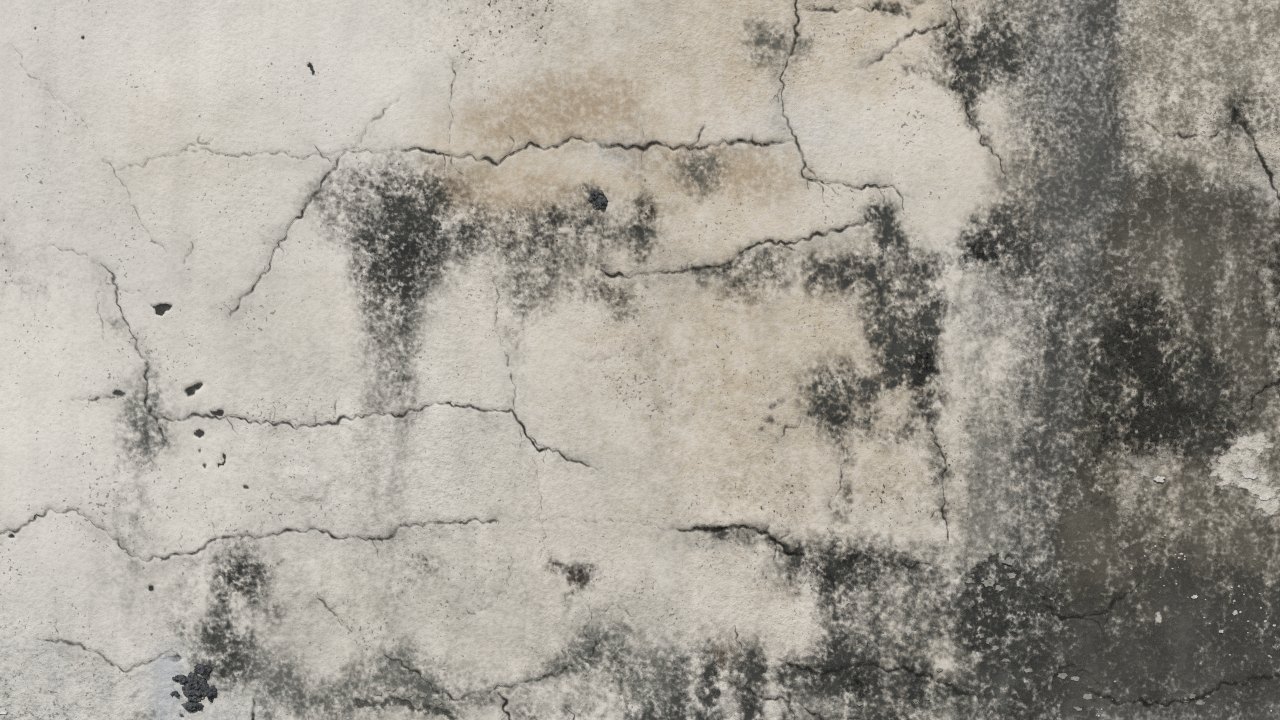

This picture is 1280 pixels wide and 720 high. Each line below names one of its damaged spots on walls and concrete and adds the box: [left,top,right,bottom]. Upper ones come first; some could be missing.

leakage [454,0,554,71]
crack [145,108,386,315]
leakage [316,149,655,343]
crack [403,0,965,278]
crack [1138,107,1280,214]
crack [90,267,589,466]
leakage [643,0,1280,720]
crack [928,420,948,538]
crack [2,509,496,570]
crack [678,524,930,587]
crack [384,604,628,720]
crack [752,663,980,720]